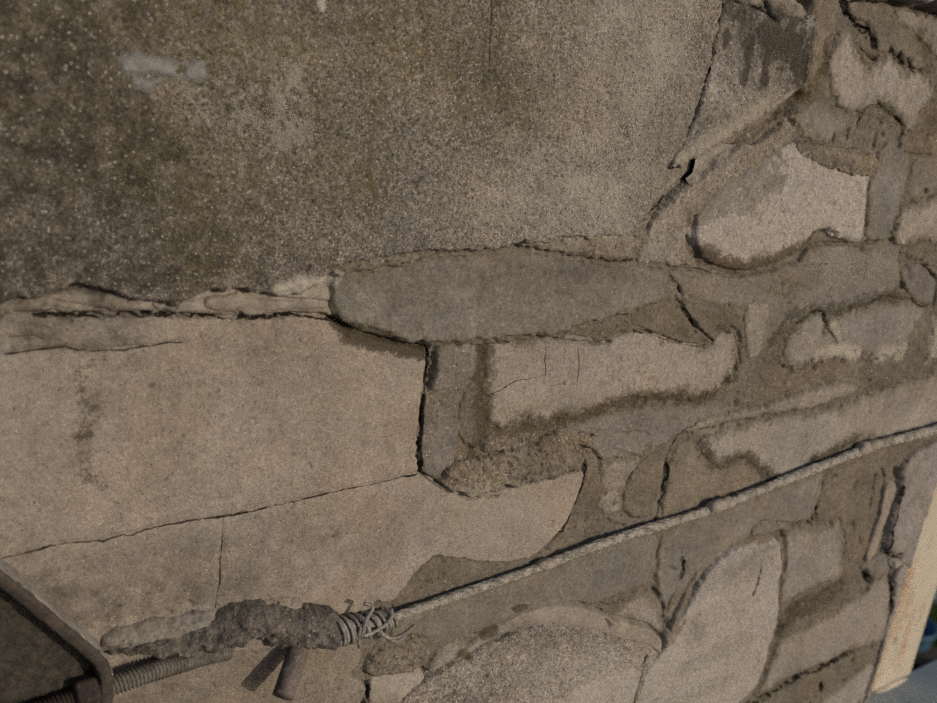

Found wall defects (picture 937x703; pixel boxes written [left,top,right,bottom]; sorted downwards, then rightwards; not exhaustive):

crack [702,3,724,91]
crack [1,346,442,609]